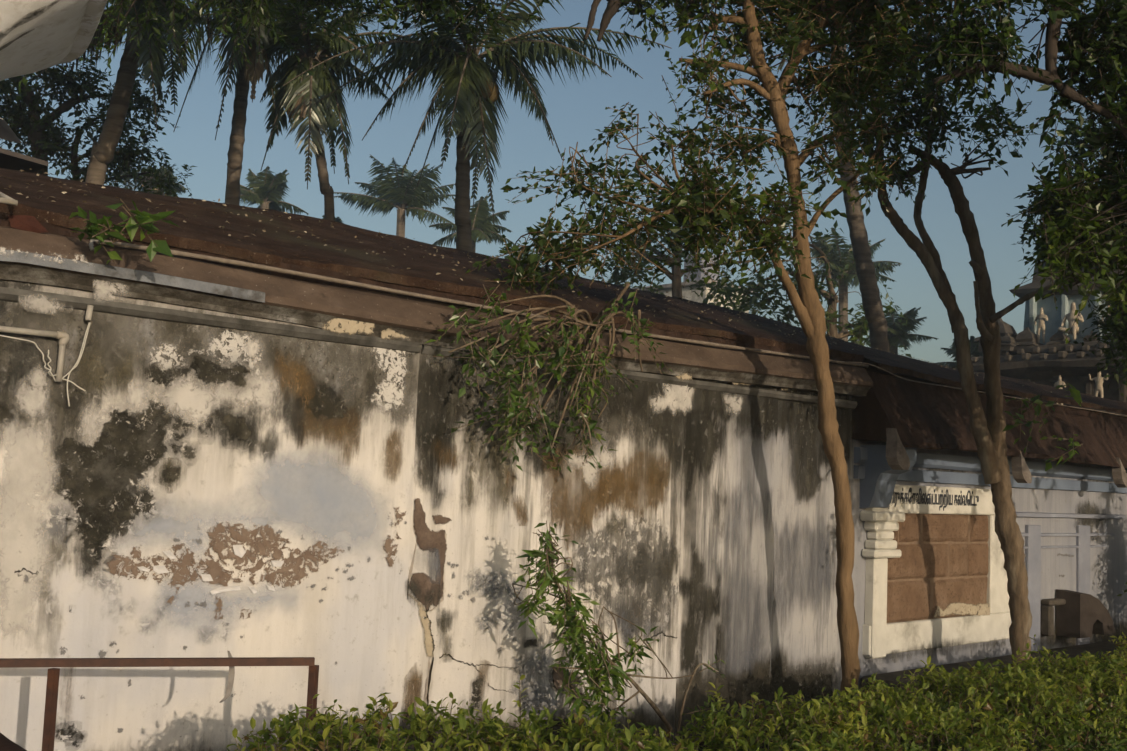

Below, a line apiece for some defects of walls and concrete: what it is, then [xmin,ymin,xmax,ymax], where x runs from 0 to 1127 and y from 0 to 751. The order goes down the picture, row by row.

damp [835,394,855,459]
peeling [107,521,354,624]
spalling [383,498,452,657]
damp [0,280,838,751]